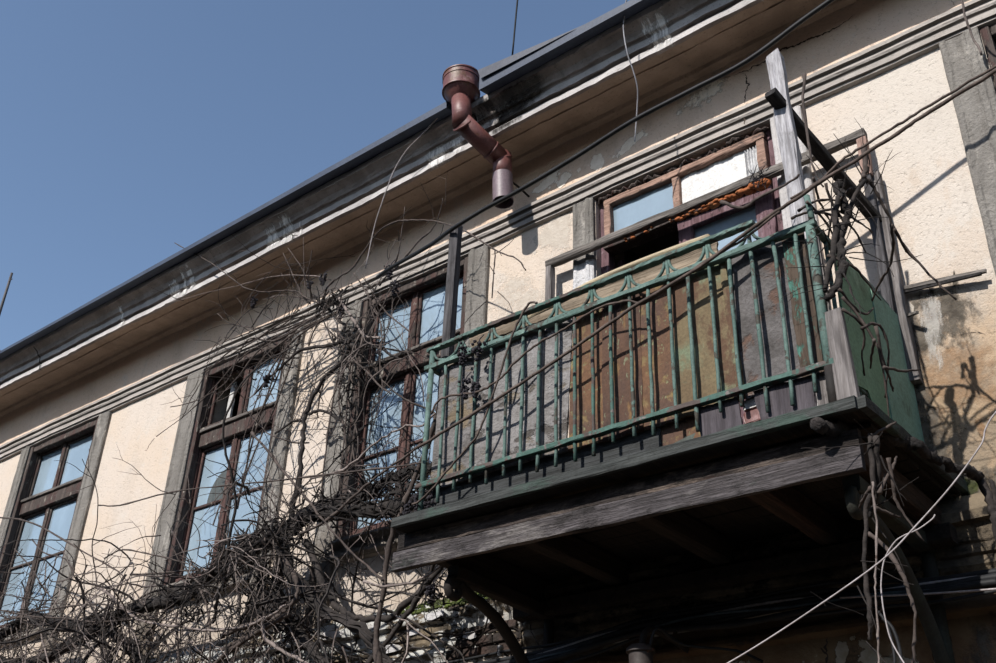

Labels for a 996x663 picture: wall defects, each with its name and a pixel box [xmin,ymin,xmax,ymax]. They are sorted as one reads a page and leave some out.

water stain [911,271,974,458]
peeling [835,635,919,663]